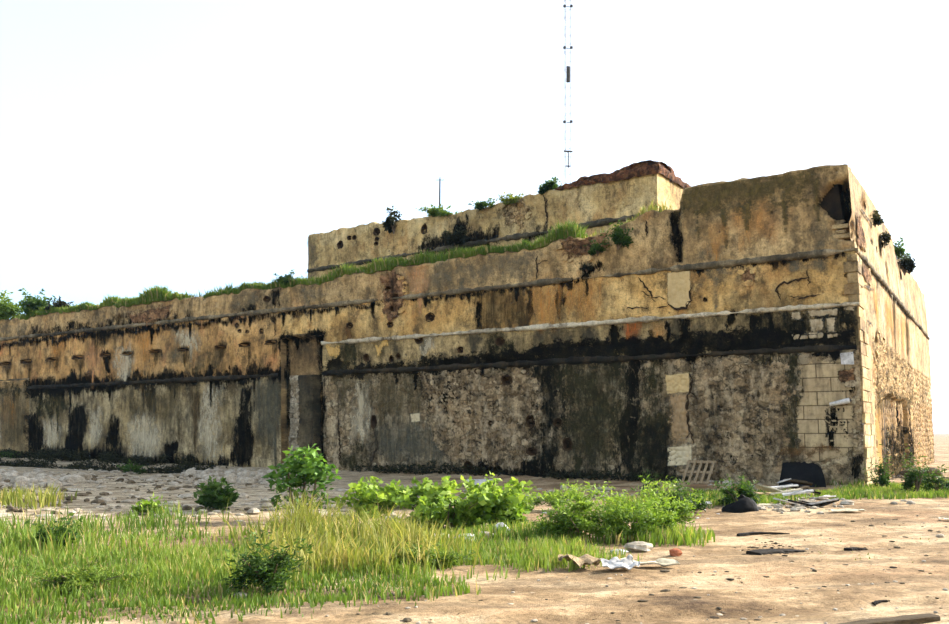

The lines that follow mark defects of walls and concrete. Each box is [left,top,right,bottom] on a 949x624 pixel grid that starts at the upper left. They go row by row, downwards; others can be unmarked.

flaking render [380,270,410,321]
crack [627,277,692,310]
damp [667,177,846,309]
crack [775,269,821,300]
damp [841,188,866,233]
damp [0,214,858,478]
flaking render [687,355,858,484]
damp [849,454,863,480]
flaking render [875,329,914,469]
damp [878,389,915,476]